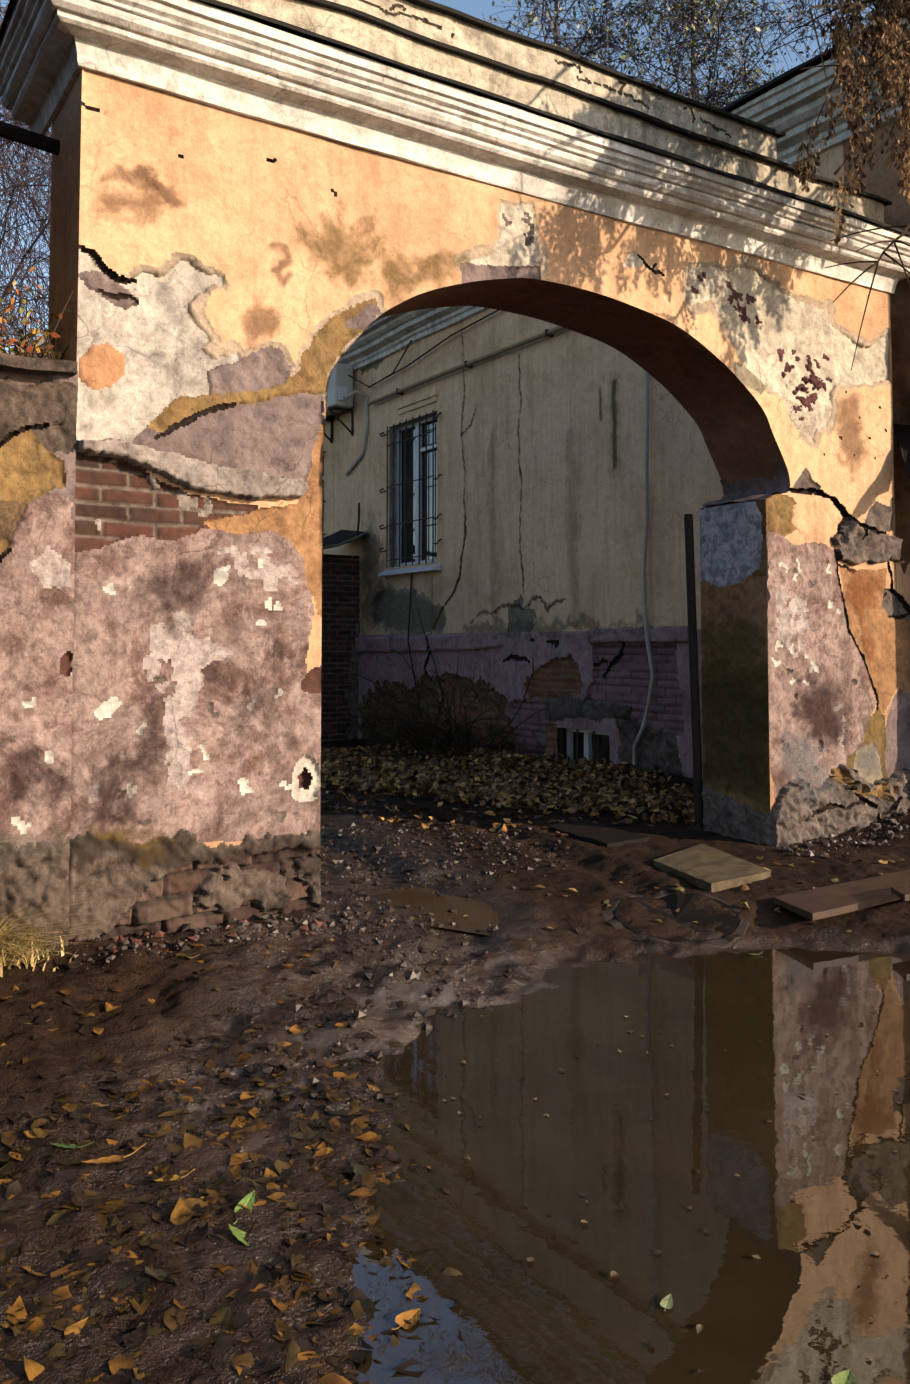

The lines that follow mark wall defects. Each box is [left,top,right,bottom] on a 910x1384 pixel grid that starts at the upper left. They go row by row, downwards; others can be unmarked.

crack [358,0,455,38]
crack [79,245,139,305]
damp [104,169,178,209]
flaking render [454,198,548,283]
flaking render [682,255,892,456]
peeling [0,249,447,957]
flaking render [507,595,536,634]
flaking render [505,643,684,776]
peeling [701,463,910,847]
crack [788,487,910,711]